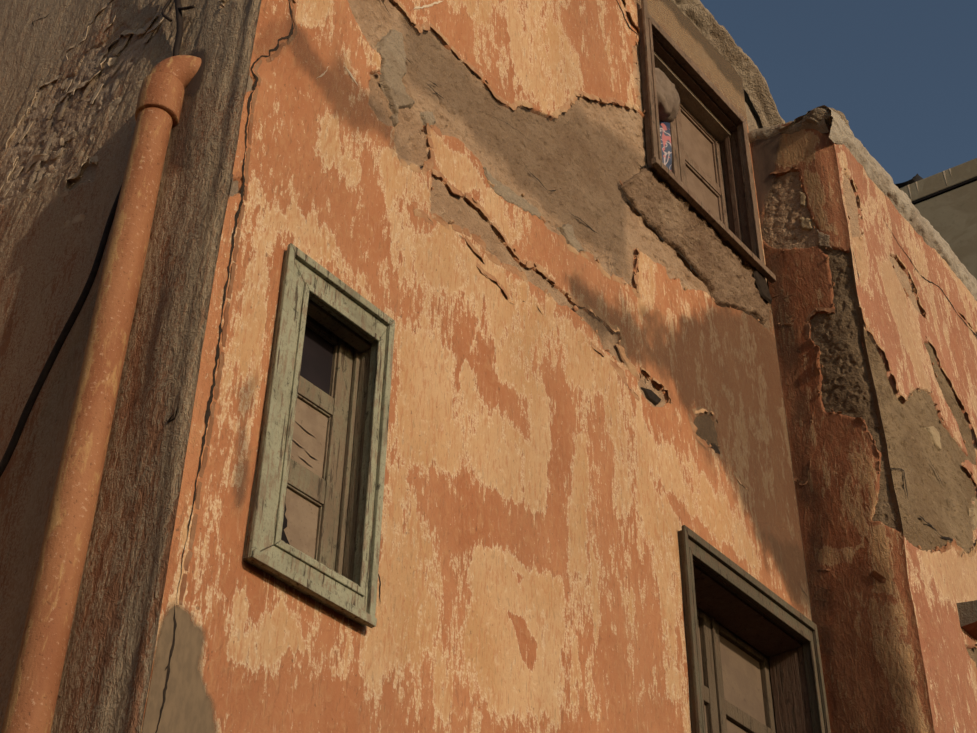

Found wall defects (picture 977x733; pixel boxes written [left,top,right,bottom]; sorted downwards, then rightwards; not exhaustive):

peeling [0,0,163,207]
crack [155,0,297,733]
flaking render [347,0,738,403]
flaking render [688,407,720,454]
flaking render [762,165,977,562]
crack [882,217,977,338]